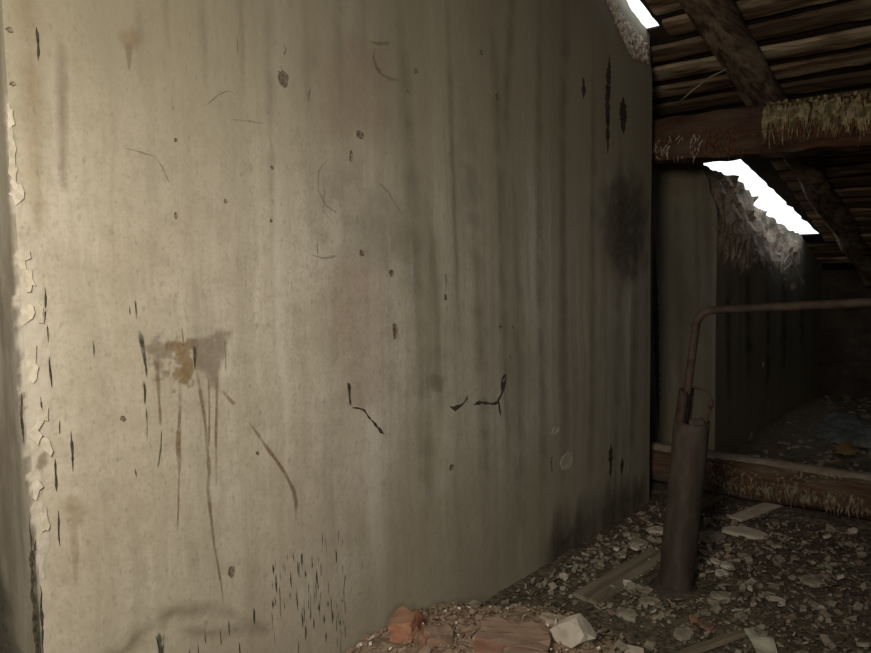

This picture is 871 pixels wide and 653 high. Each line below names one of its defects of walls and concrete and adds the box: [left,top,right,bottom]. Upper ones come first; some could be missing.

flaking render [606,0,650,64]
spalling [7,103,24,214]
flaking render [707,176,801,275]